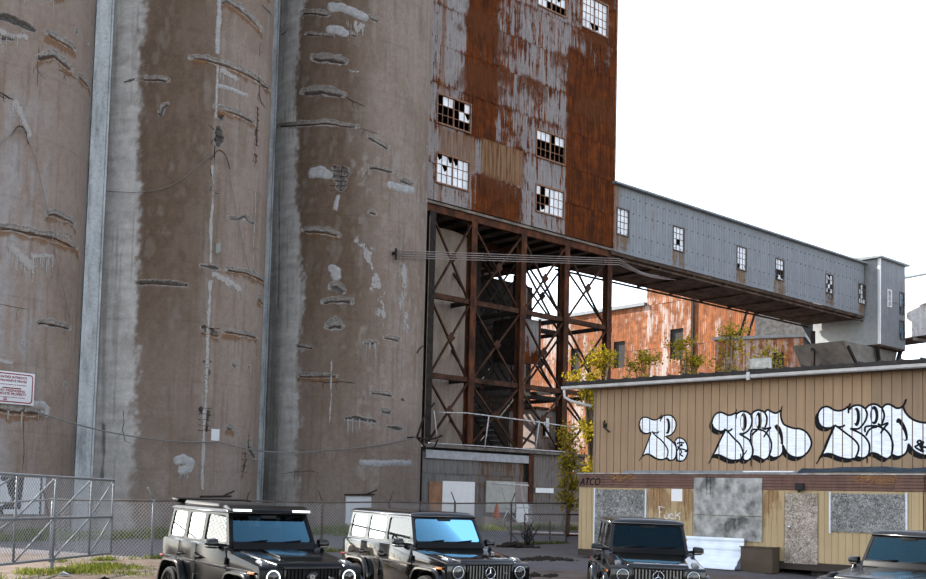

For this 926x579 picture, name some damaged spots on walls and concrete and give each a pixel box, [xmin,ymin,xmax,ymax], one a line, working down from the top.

spalling [0,9,91,96]
spalling [184,51,271,94]
corrosion [458,9,507,53]
corrosion [459,61,548,105]
corrosion [553,52,574,82]
corrosion [582,32,607,55]
spalling [210,101,261,167]
spalling [276,116,392,153]
spalling [328,163,352,194]
spalling [365,162,427,216]
spalling [0,206,80,258]